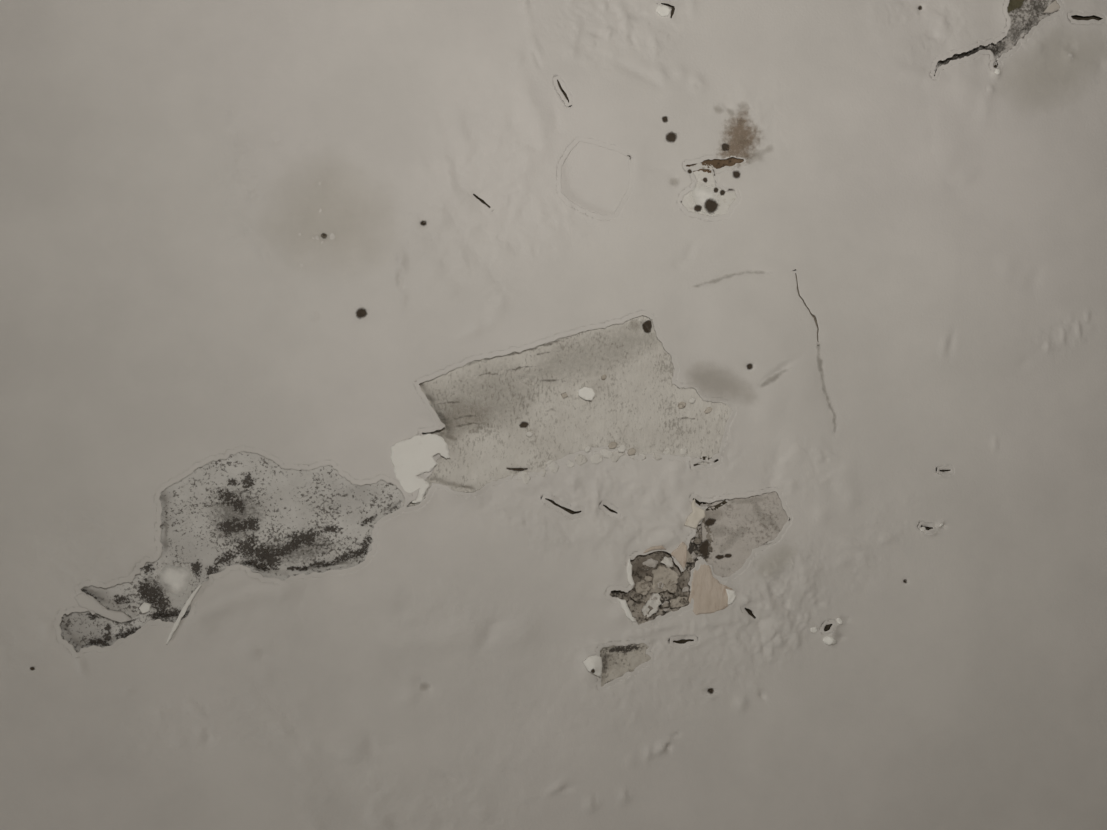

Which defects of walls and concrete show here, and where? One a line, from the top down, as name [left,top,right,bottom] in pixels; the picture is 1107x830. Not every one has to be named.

peeling [929,0,1065,80]
damp [662,116,676,142]
crack [792,270,823,345]
peeling [52,311,737,659]
spalling [583,486,792,692]